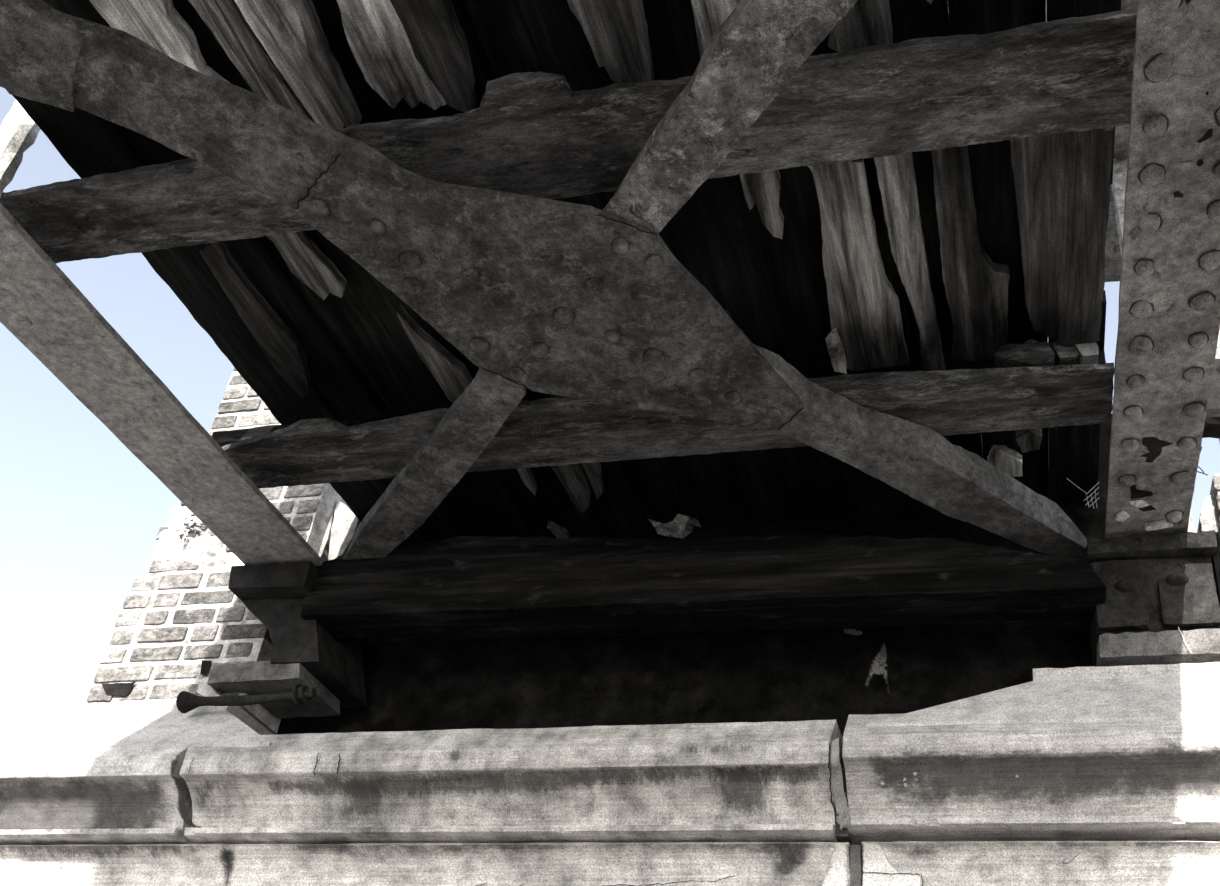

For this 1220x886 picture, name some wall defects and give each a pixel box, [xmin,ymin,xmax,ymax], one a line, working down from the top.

water stain [344,781,381,816]
water stain [715,768,767,812]
crack [828,738,923,886]